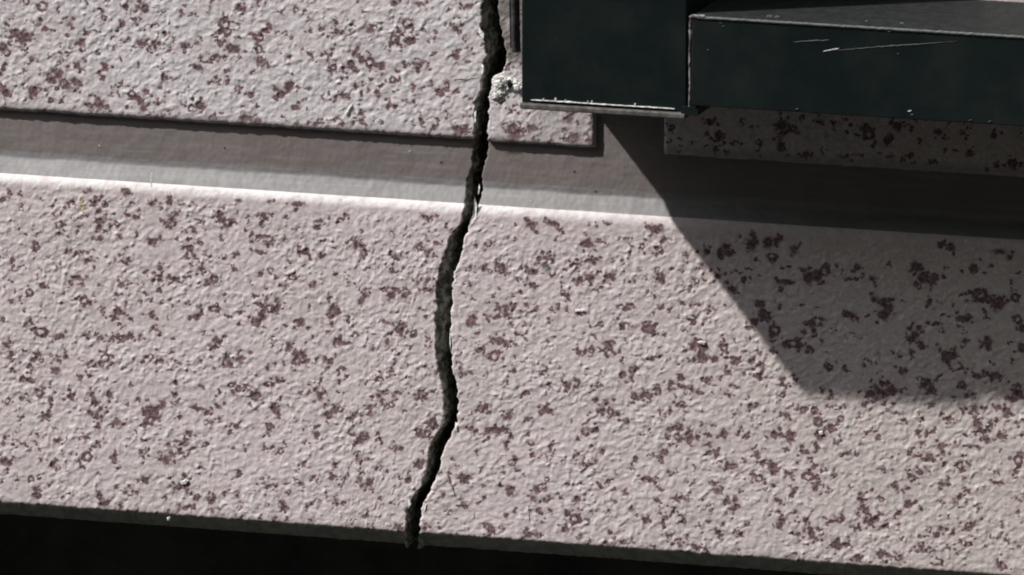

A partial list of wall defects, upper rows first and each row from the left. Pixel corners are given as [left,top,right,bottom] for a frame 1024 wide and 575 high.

crack [404,0,507,549]